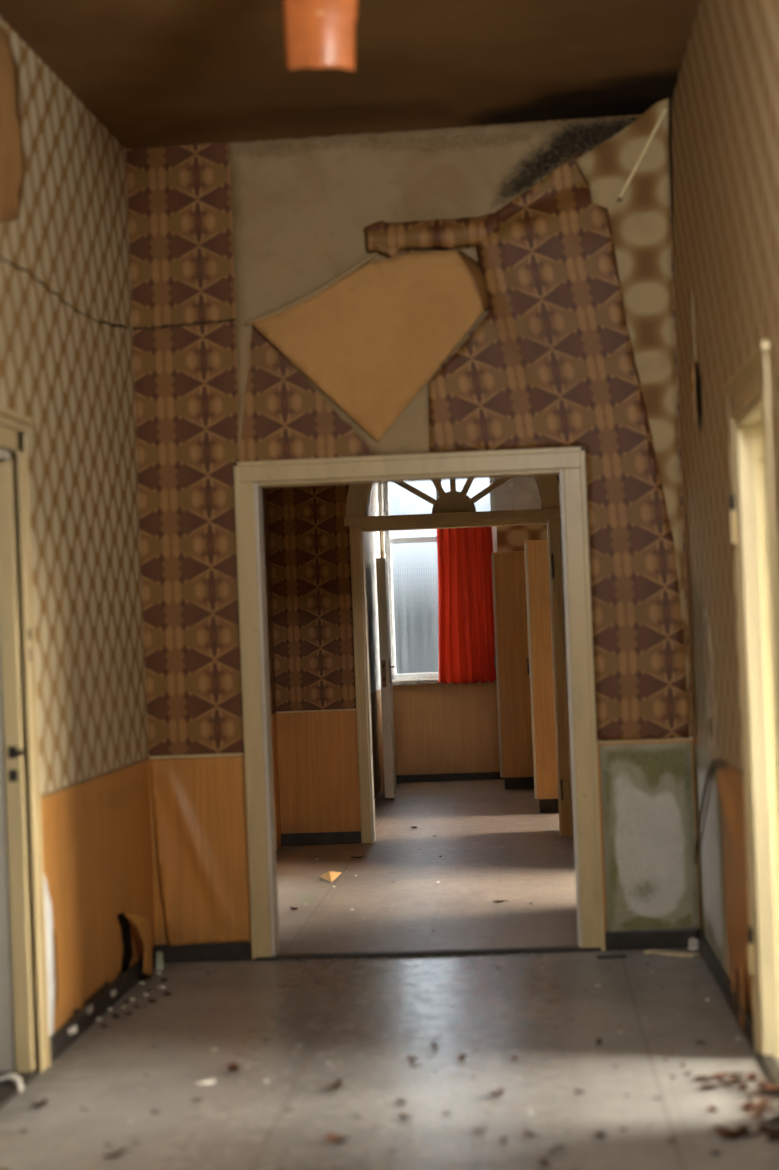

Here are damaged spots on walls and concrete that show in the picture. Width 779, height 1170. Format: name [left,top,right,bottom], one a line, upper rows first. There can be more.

flaking render [0,26,25,222]
flaking render [229,116,639,455]
water stain [603,746,716,947]